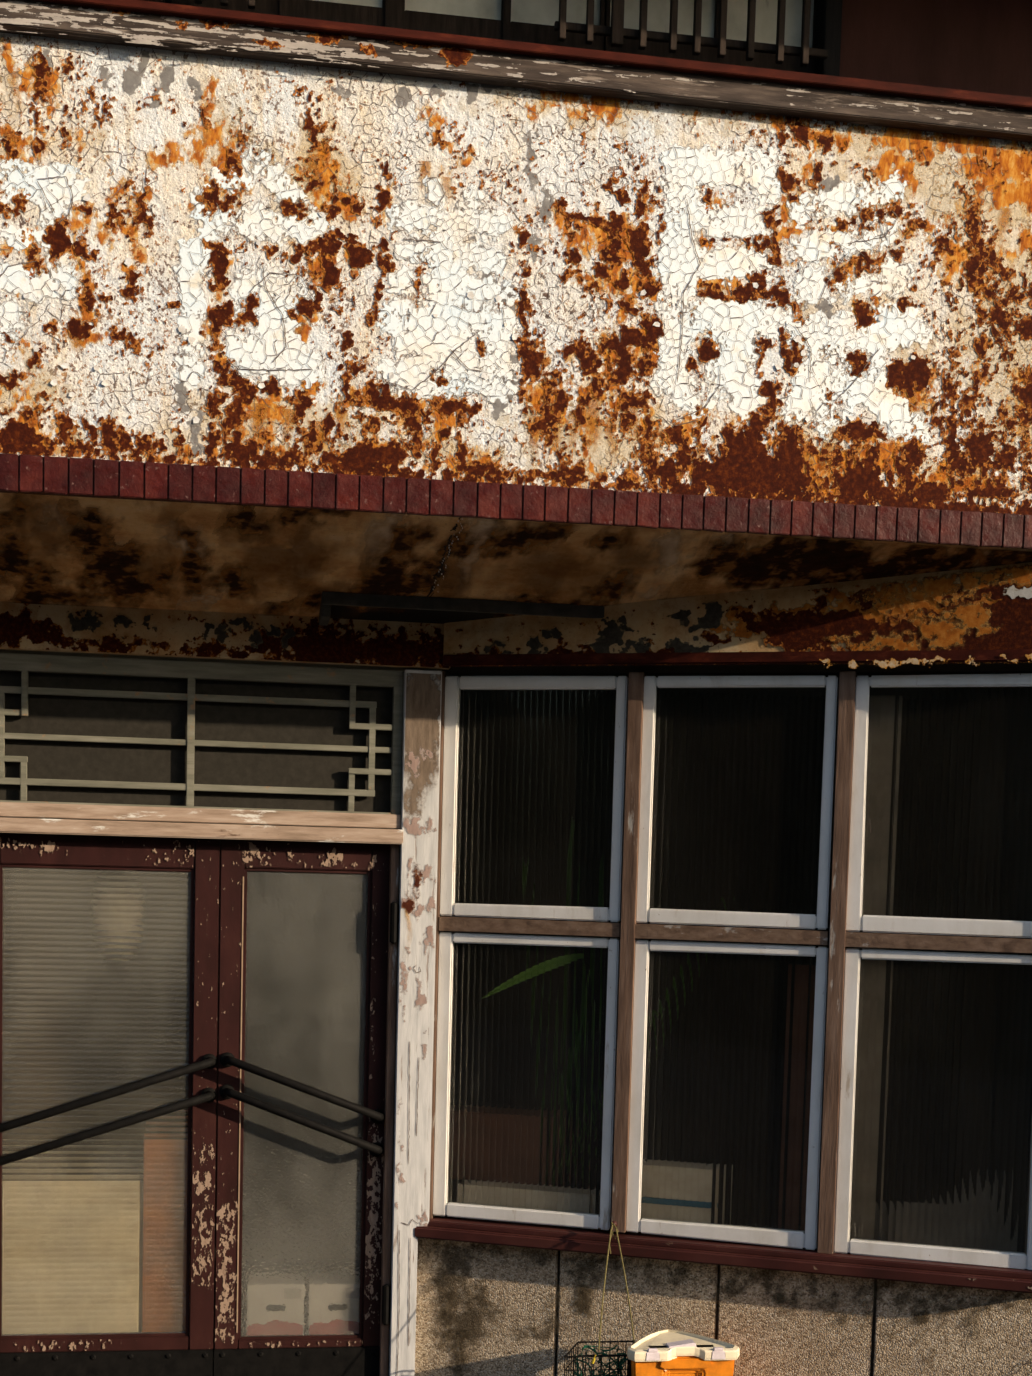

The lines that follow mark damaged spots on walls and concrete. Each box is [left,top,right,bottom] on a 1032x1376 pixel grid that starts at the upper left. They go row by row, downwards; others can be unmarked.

rust [0,492,1032,668]
peeling [1004,585,1032,599]
peeling [399,858,436,1022]
leakage [425,1239,506,1376]
leakage [518,1248,627,1340]
leakage [644,1260,1022,1335]